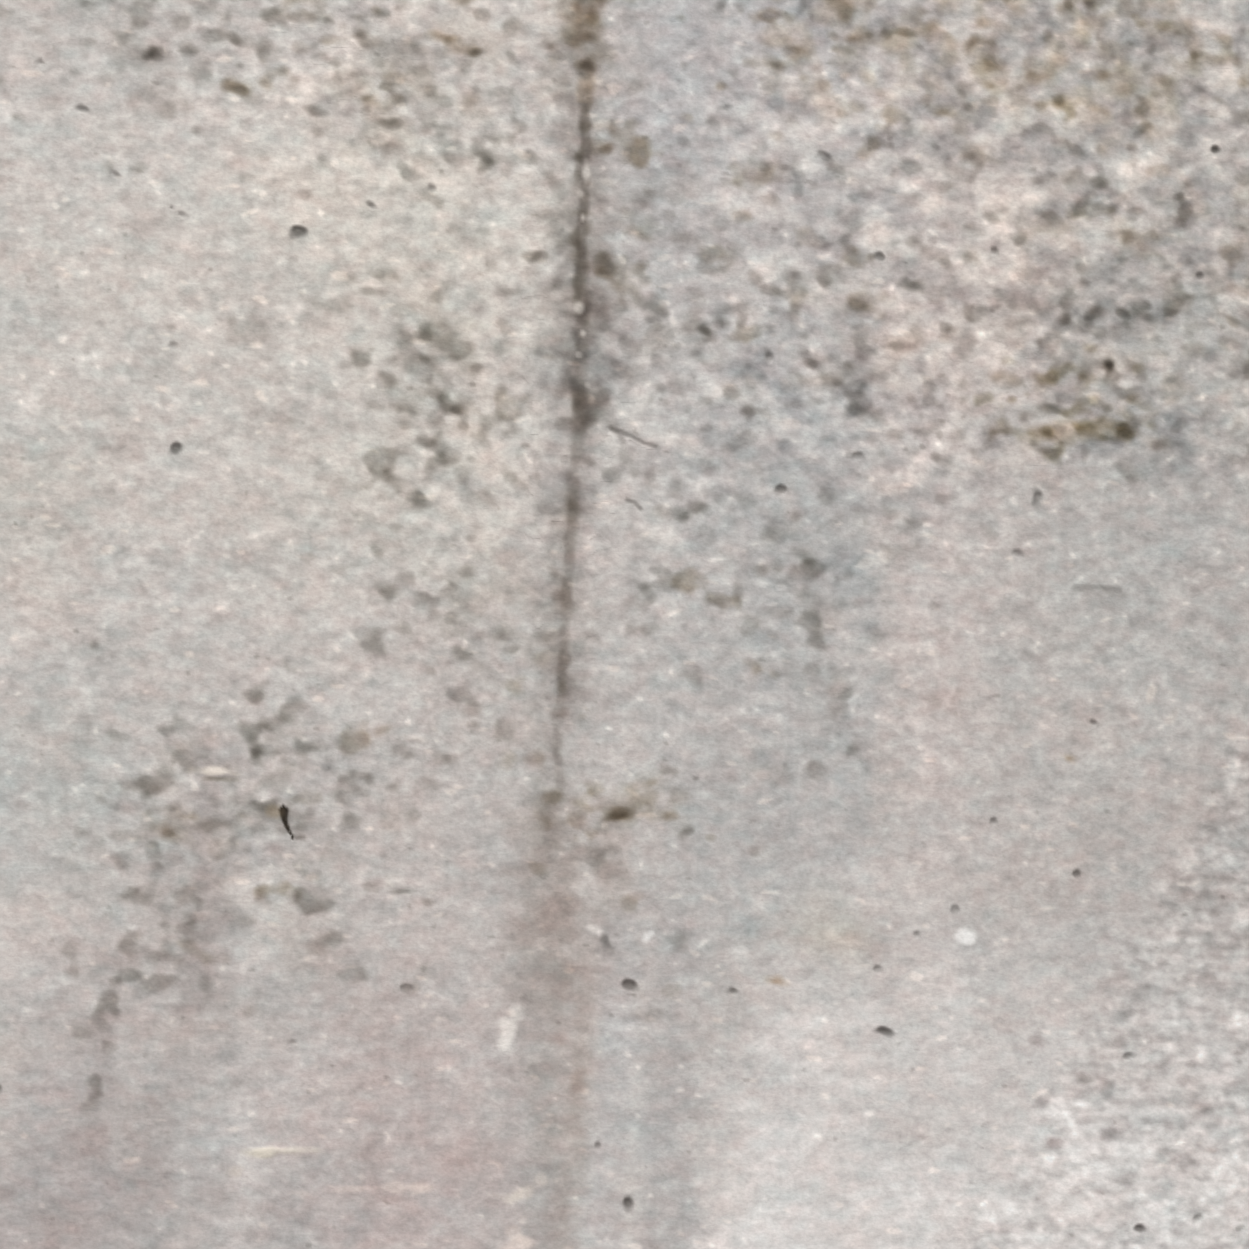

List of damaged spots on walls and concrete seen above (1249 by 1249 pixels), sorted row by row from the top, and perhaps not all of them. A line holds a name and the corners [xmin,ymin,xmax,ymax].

crack [504,0,660,936]